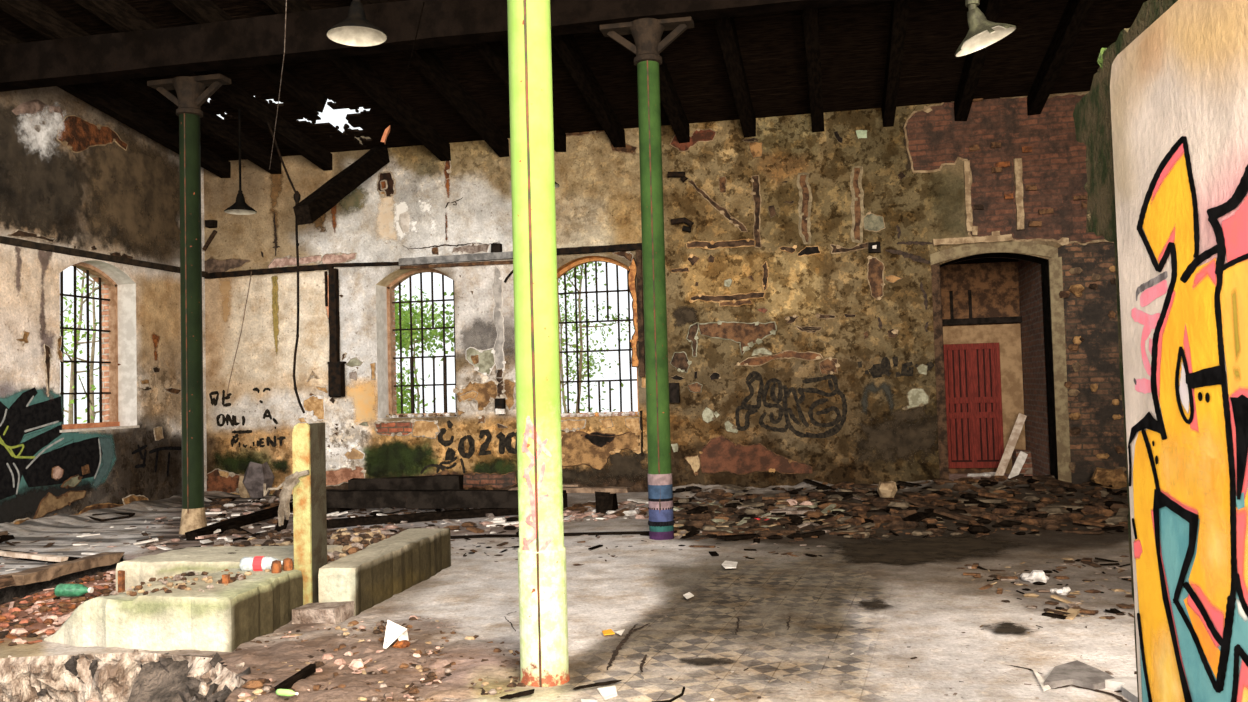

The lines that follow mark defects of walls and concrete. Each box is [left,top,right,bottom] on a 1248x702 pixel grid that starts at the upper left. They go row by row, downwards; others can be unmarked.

damp [0,107,180,334]
spalling [57,115,128,153]
spalling [742,138,763,159]
spalling [670,166,903,476]
spalling [897,92,1127,485]